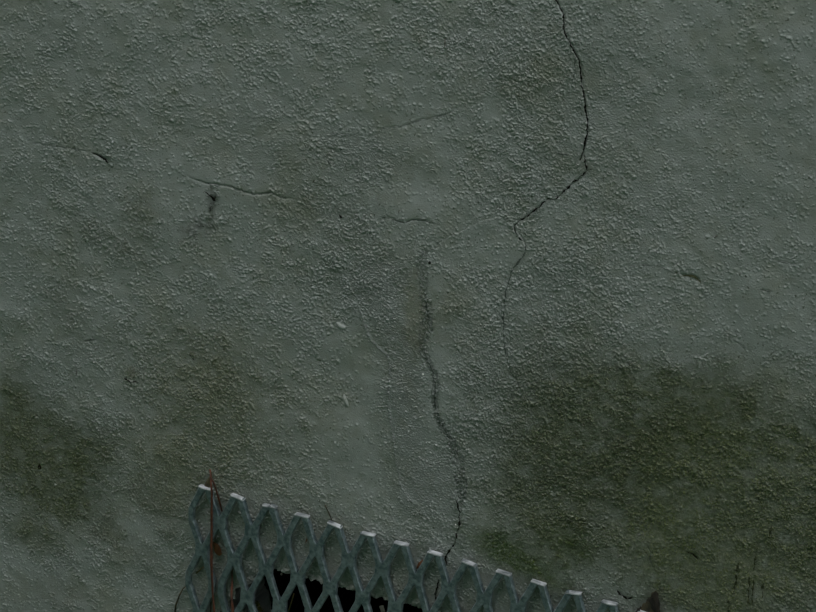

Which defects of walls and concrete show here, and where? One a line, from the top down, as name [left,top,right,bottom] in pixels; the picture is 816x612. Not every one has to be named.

crack [498,0,591,388]
crack [418,256,468,600]